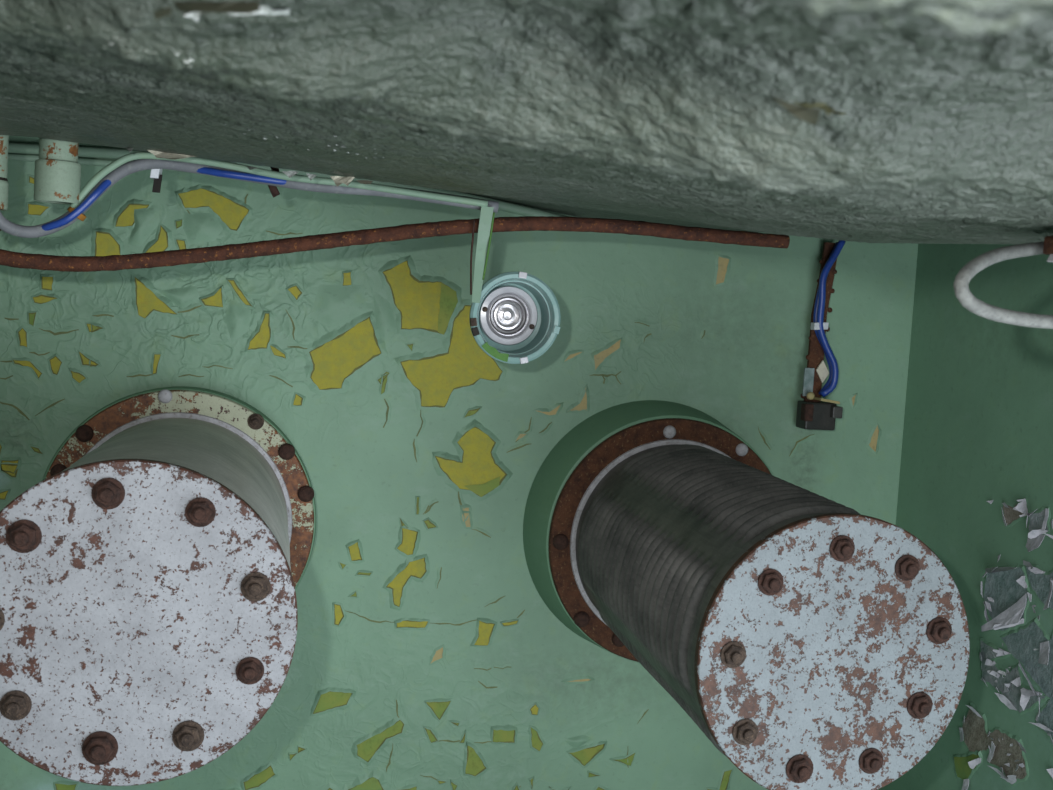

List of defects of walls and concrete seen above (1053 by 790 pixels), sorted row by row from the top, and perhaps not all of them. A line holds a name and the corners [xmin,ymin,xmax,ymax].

peeling [91,199,153,256]
peeling [142,184,253,253]
peeling [12,274,101,386]
peeling [130,273,181,322]
peeling [199,278,288,360]
peeling [291,255,509,412]
peeling [432,406,513,529]
peeling [382,496,438,630]
peeling [979,497,1053,744]
peeling [321,716,418,790]
peeling [423,698,489,790]
peeling [953,701,1029,790]